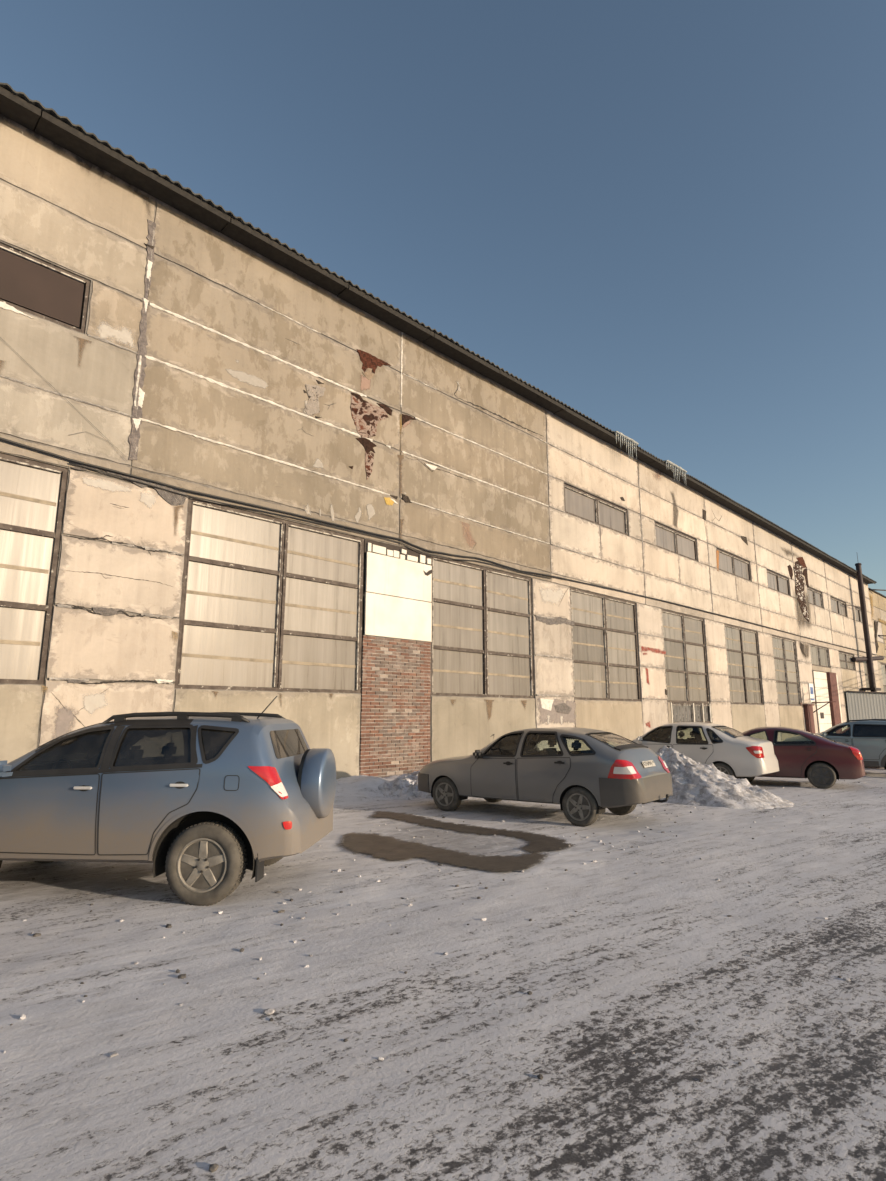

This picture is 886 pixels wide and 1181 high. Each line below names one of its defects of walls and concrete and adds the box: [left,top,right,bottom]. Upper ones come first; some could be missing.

spalling [349,349,416,479]
spalling [787,557,810,627]